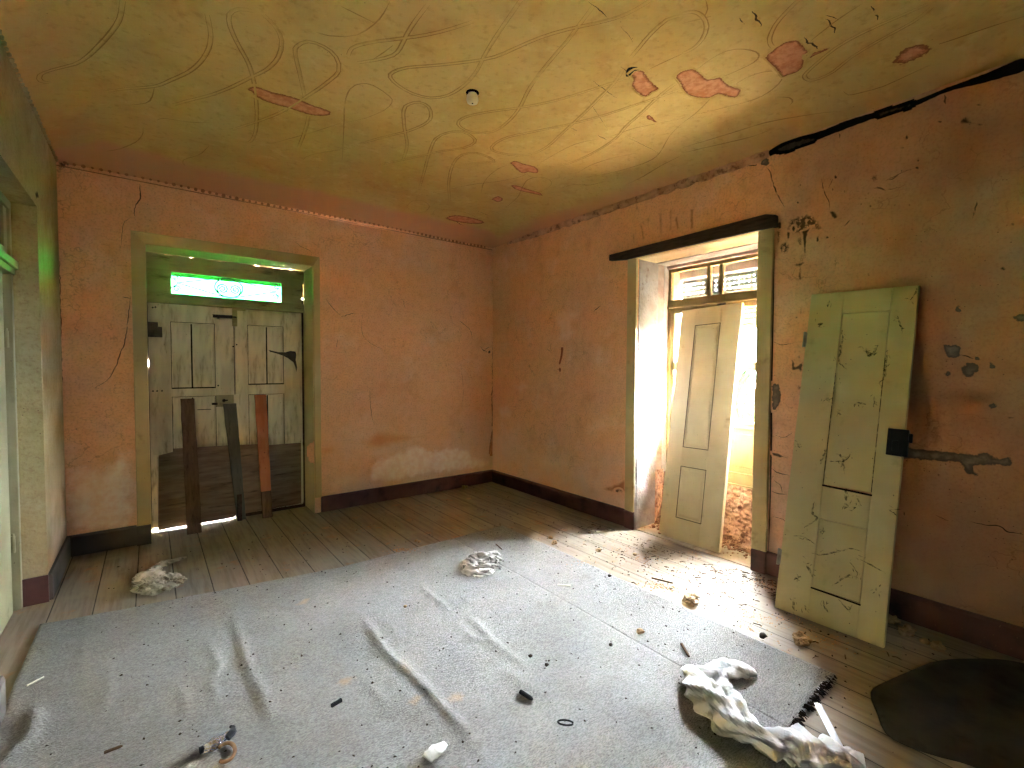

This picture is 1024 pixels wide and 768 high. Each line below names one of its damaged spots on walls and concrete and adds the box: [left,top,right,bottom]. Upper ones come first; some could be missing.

peeling [760,37,834,80]
peeling [885,39,940,69]
peeling [241,83,336,118]
peeling [621,66,745,100]
flaking render [939,340,1001,381]
leakage [307,423,493,496]